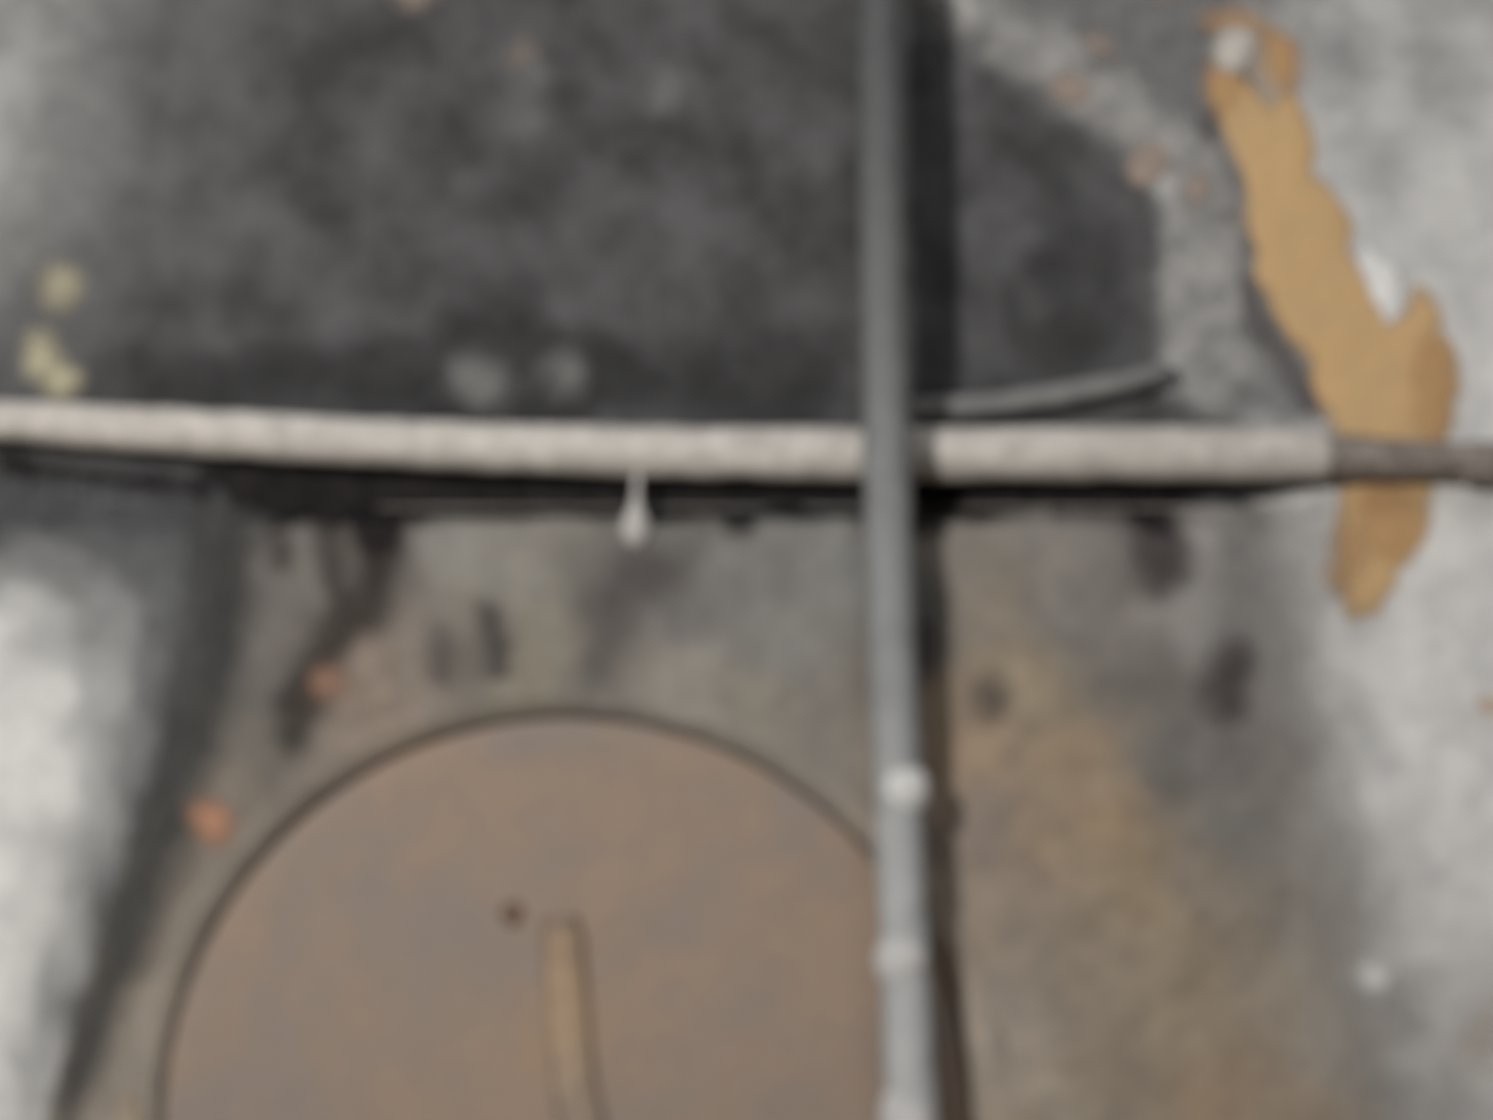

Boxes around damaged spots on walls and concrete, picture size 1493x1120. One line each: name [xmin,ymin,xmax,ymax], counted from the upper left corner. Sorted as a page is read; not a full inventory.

peeling [1210,15,1459,442]
leakage [154,342,449,416]
leakage [521,343,827,425]
leakage [273,506,400,588]
peeling [1331,478,1431,619]